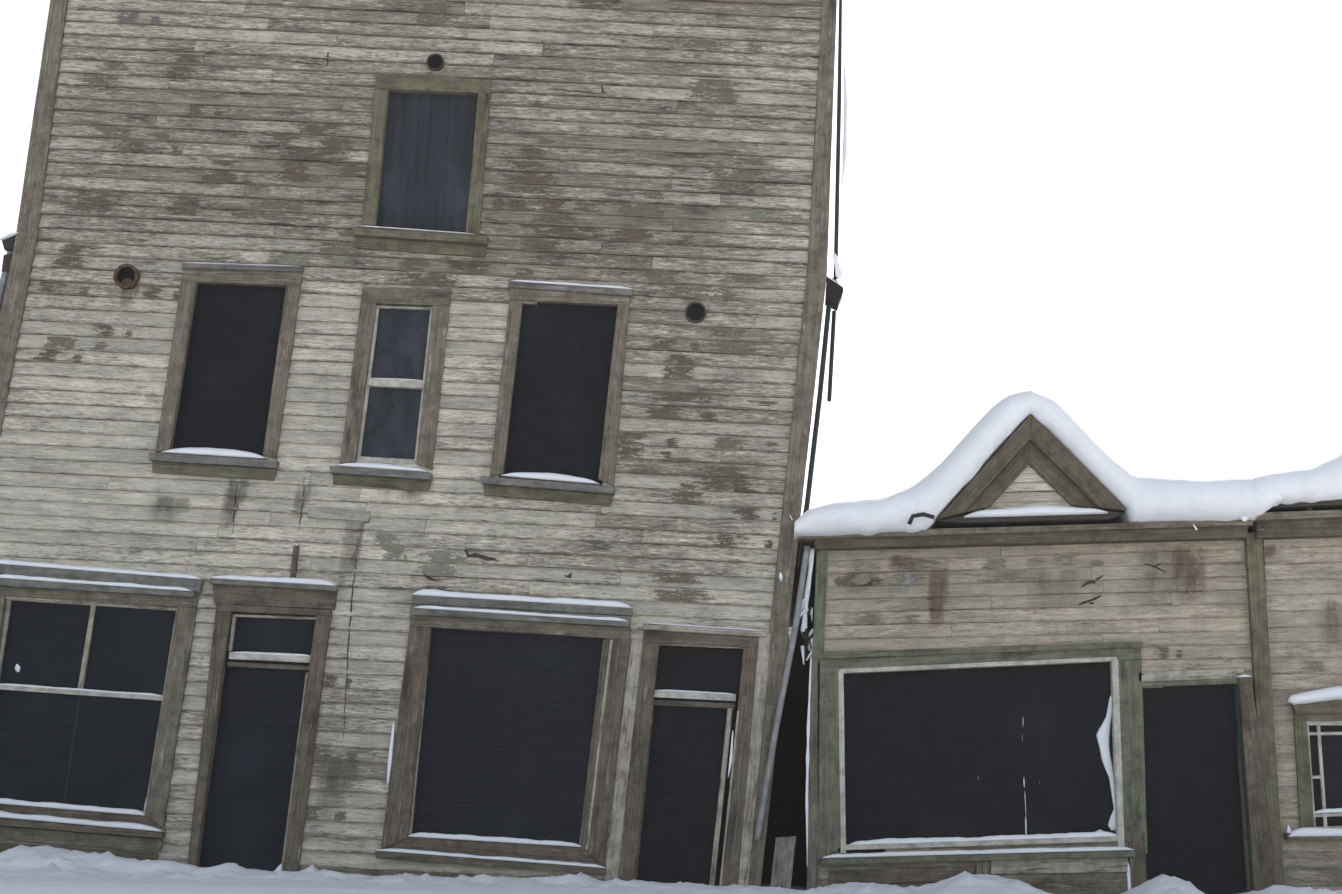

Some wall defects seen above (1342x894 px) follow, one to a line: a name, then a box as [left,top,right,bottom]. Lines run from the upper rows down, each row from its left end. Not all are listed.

peeling [255,123,367,183]
peeling [60,191,130,212]
peeling [31,325,133,362]
peeling [373,533,410,560]